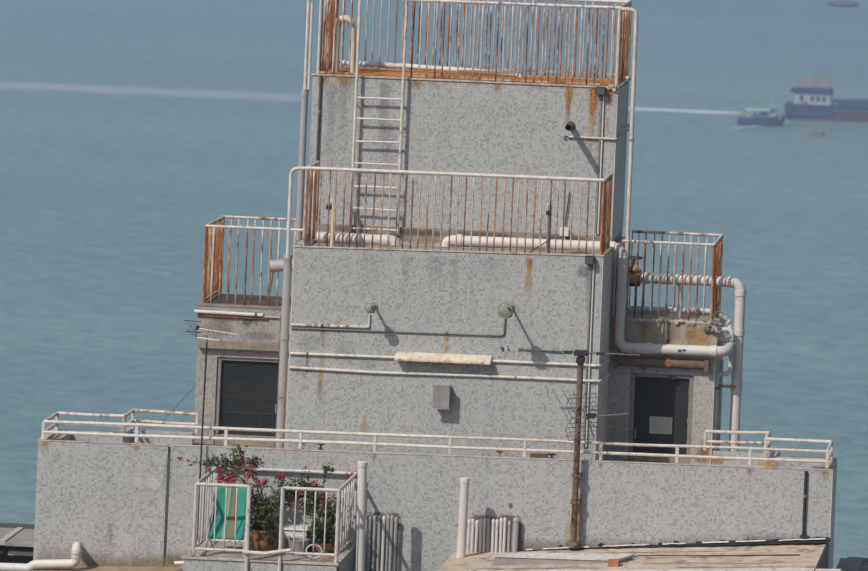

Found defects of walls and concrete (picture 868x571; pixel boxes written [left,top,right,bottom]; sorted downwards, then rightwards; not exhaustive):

rust [322,67,615,132]